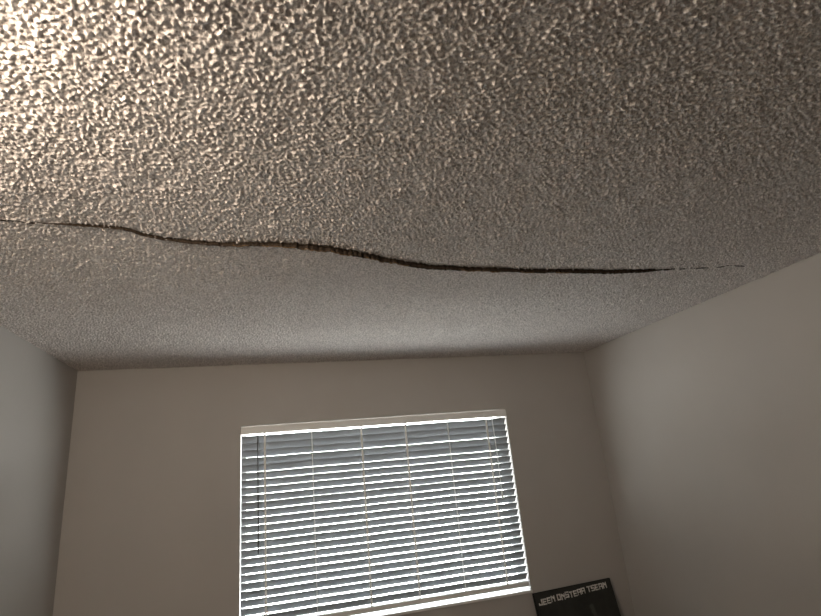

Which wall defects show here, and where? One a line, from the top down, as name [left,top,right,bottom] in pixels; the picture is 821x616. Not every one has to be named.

crack [0,220,744,274]